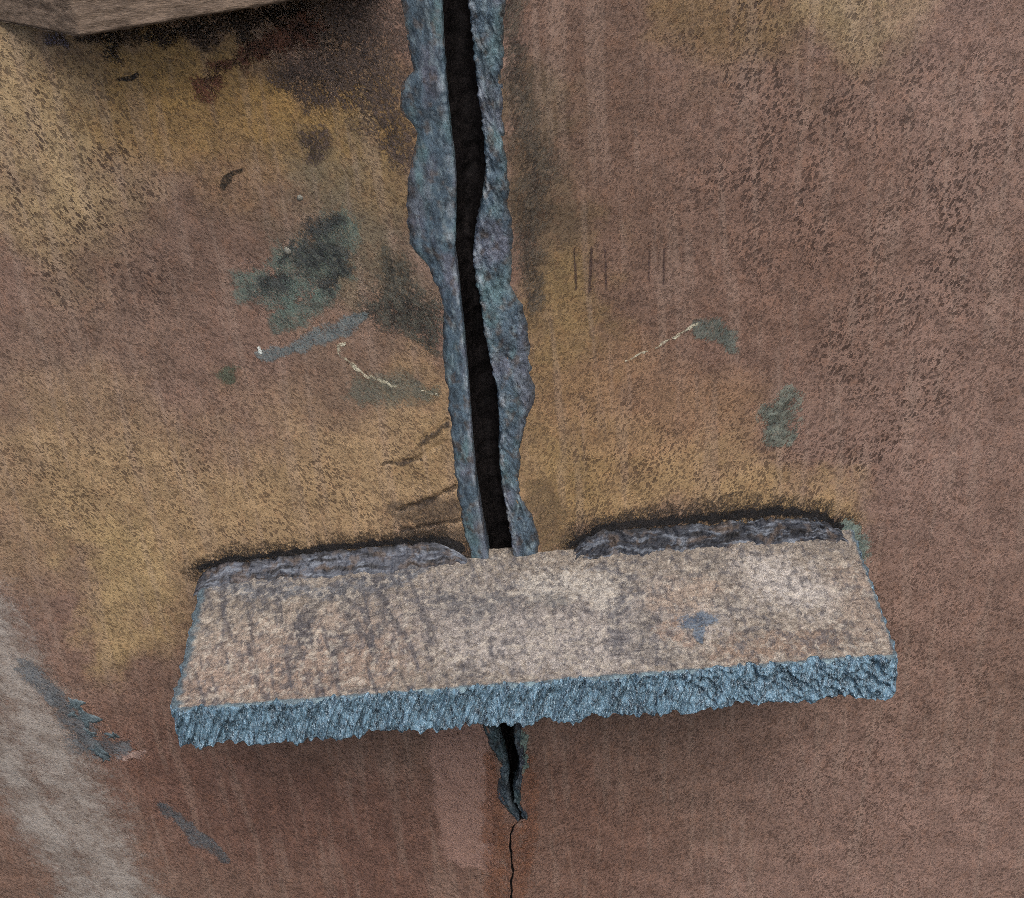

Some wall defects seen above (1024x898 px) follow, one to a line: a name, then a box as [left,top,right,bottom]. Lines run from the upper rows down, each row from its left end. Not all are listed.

crack [382,0,540,559]
crack [483,723,528,898]